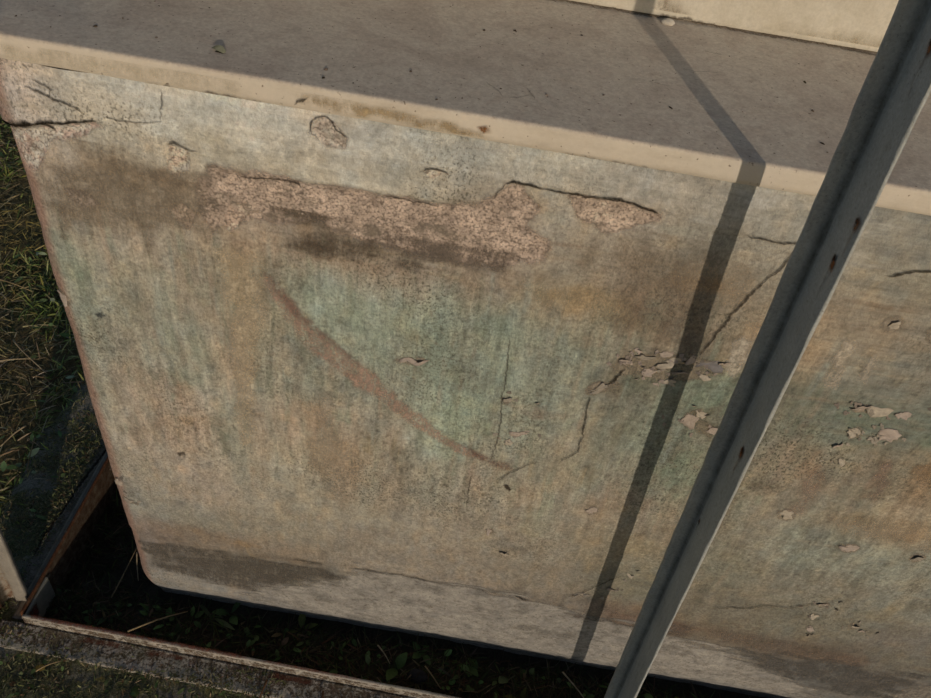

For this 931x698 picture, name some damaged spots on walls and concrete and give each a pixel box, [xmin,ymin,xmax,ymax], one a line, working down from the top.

crack [0,80,169,130]
water stain [270,206,330,223]
spalling [170,164,551,268]
spalling [568,195,660,233]
water stain [288,235,374,261]
water stain [387,236,520,272]
crack [700,237,796,355]
crack [888,270,931,278]
peeling [606,348,731,387]
crack [566,399,590,459]
peeling [819,401,912,467]
water stain [139,541,339,591]